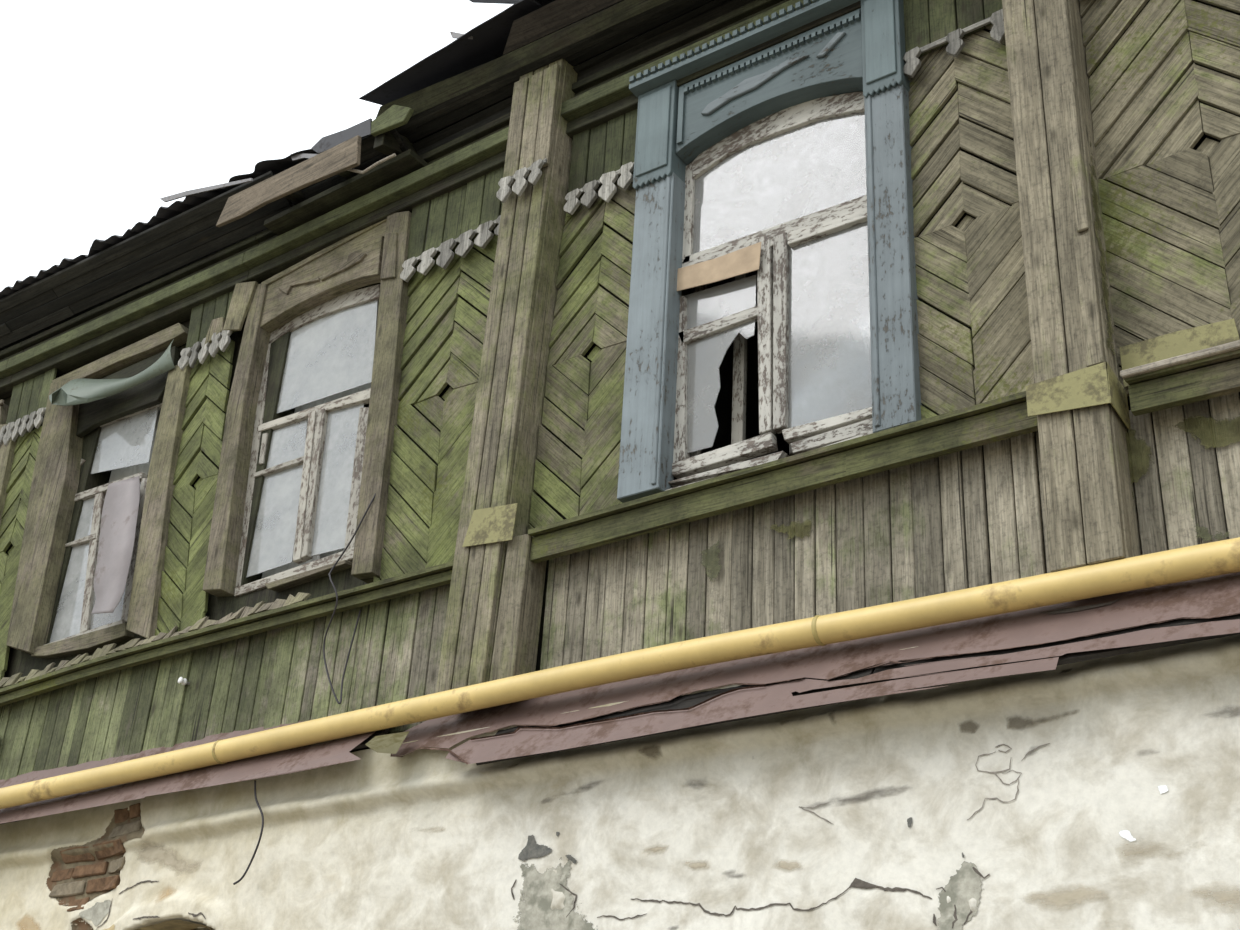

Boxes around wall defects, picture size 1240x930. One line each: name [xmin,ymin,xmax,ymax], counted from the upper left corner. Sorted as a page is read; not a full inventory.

spalling [46,803,145,930]
peeling [511,832,598,930]
crack [597,878,932,920]
peeling [933,852,990,930]